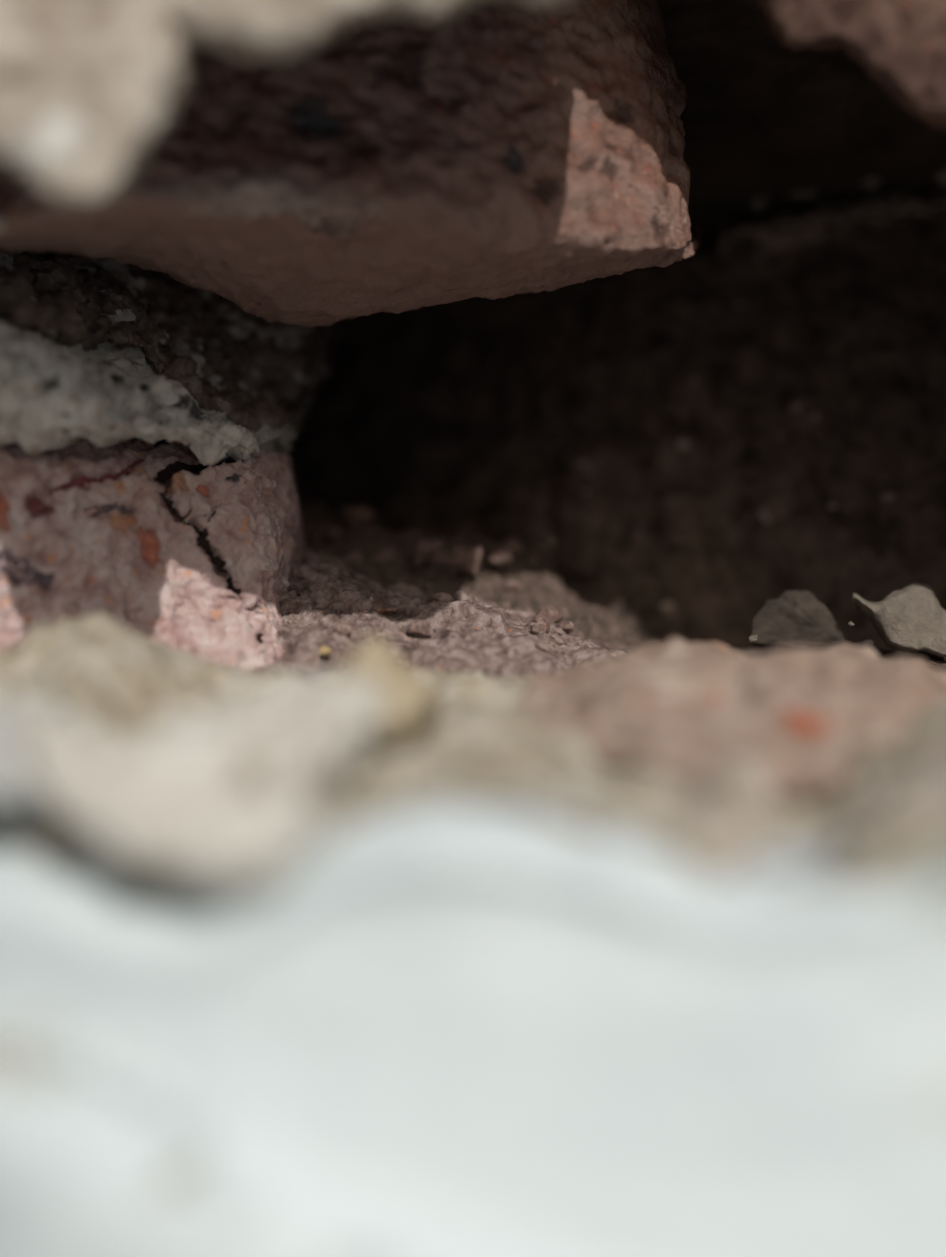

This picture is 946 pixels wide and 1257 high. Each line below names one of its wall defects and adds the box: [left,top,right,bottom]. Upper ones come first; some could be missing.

peeling [0,0,471,206]
spalling [175,395,204,420]
spalling [0,549,55,592]
crack [154,458,263,643]
spalling [749,590,876,652]
spalling [0,612,946,903]